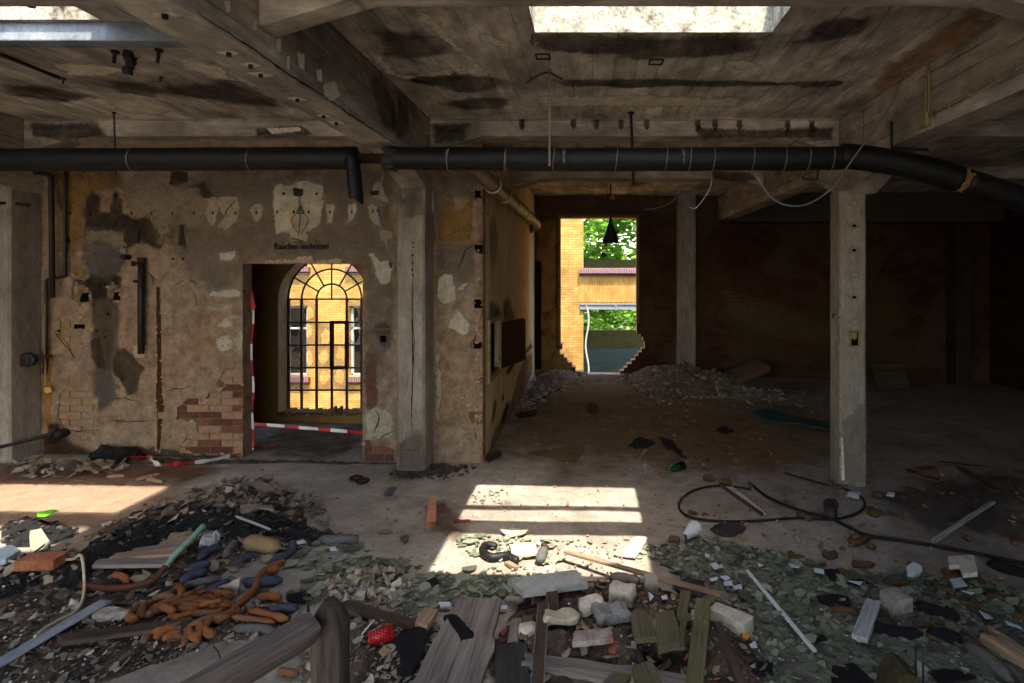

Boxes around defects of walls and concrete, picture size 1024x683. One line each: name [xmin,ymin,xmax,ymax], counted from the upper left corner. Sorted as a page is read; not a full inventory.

leakage [368,13,487,134]
leakage [81,241,124,280]
flaking render [56,388,99,440]
leakage [91,338,144,406]
flaking render [158,367,244,455]
crack [373,265,425,470]